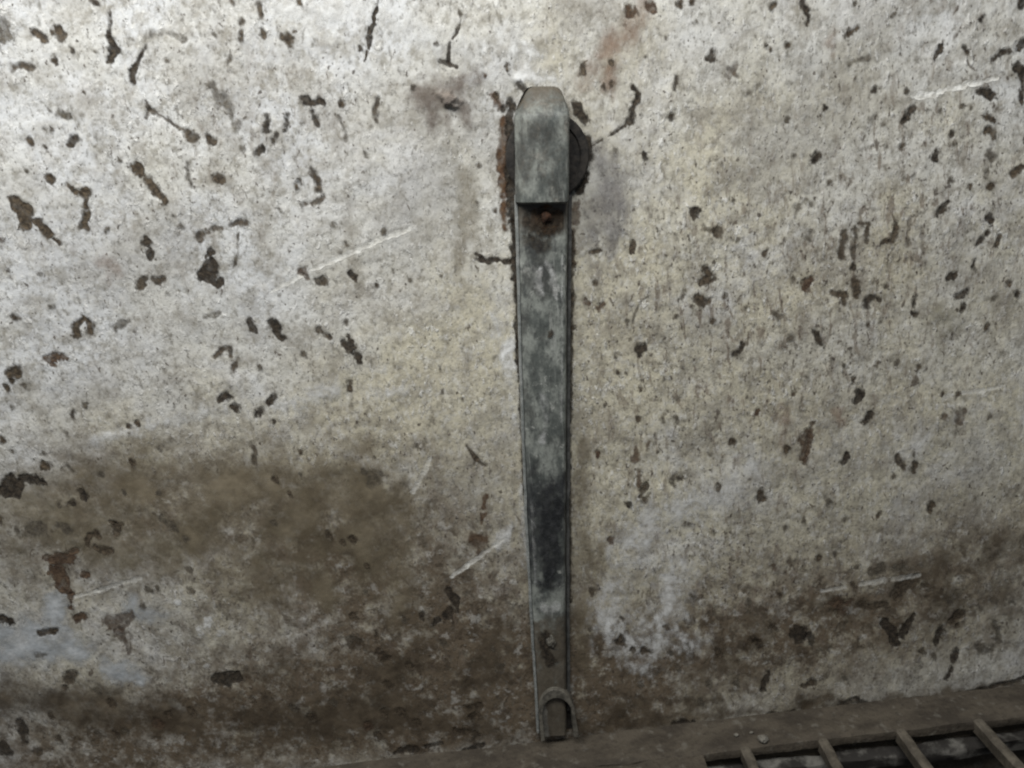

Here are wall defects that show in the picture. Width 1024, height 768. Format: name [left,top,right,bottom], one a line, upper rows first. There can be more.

rust [491,91,508,231]
water stain [183,460,409,571]
water stain [0,593,89,665]
water stain [623,559,687,673]
water stain [0,661,200,734]